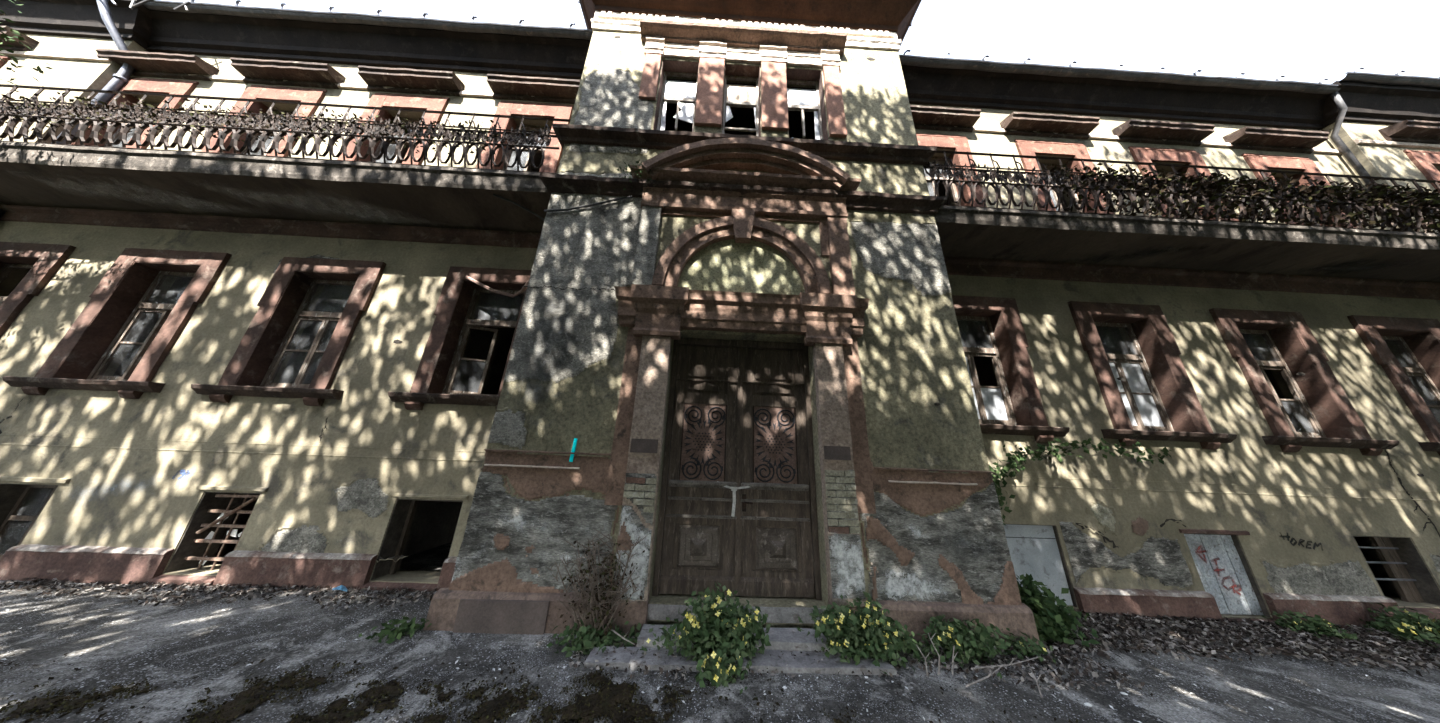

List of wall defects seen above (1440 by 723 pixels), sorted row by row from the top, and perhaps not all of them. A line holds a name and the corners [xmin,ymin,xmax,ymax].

spalling [452,468,657,600]
spalling [825,470,1011,604]
spalling [1059,499,1197,591]